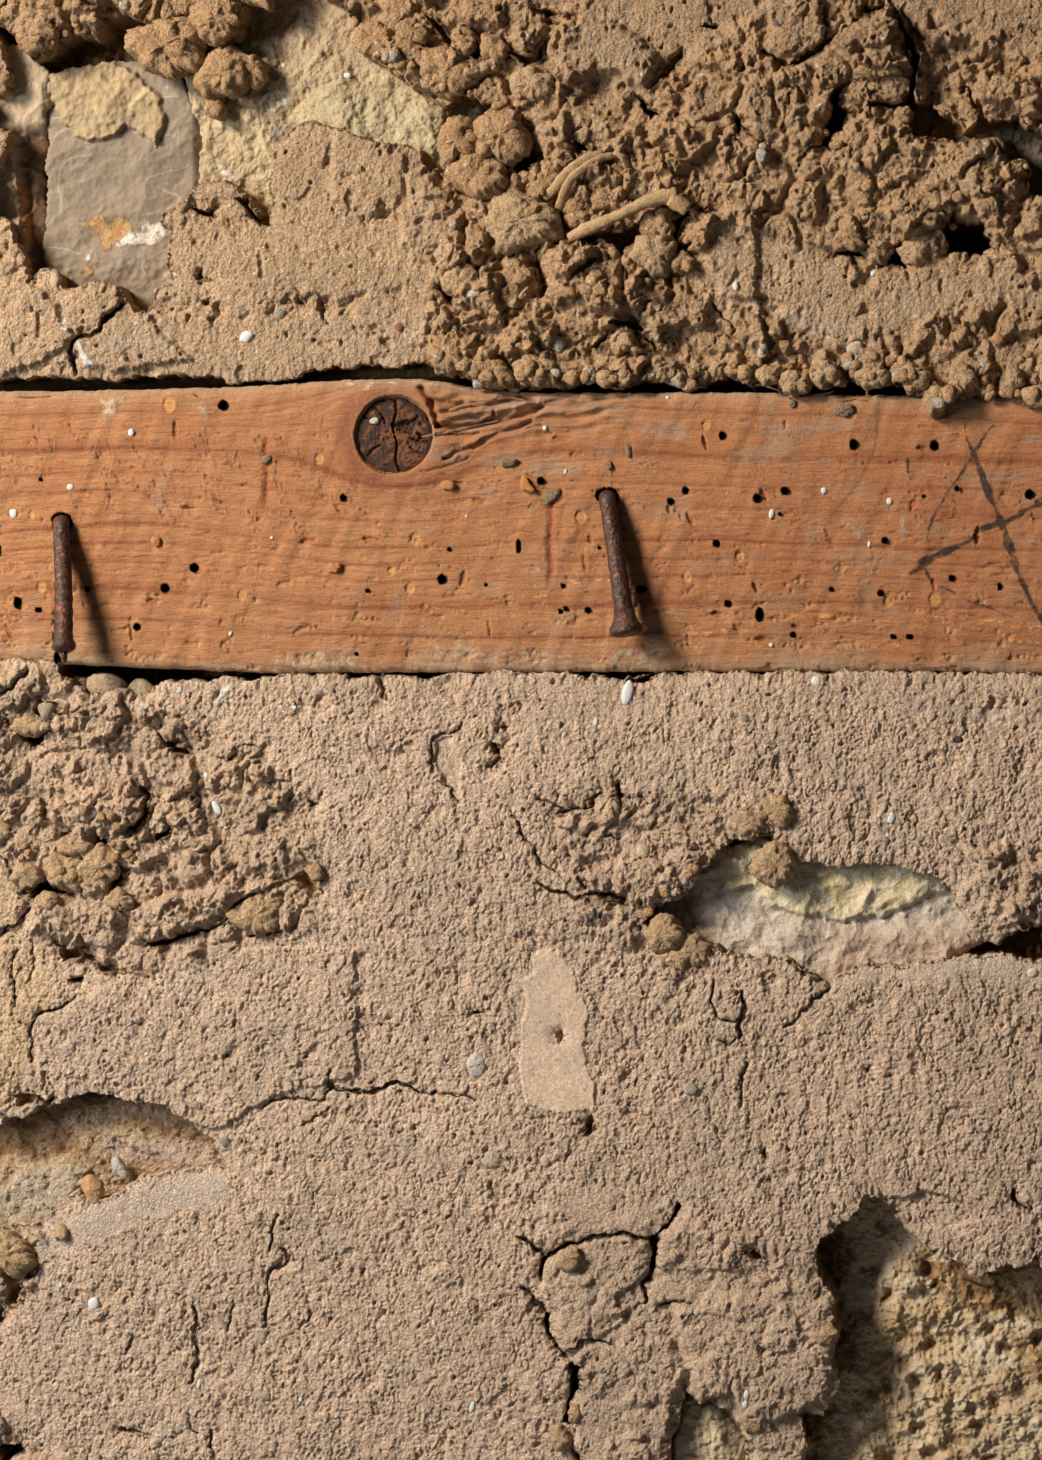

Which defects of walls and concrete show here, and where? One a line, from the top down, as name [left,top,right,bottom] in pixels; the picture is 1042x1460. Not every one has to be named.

spalling [0,0,275,122]
crack [761,0,898,169]
spalling [344,0,1042,419]
crack [0,855,75,1063]
crack [263,1070,476,1124]
crack [517,1237,544,1256]
crack [585,1231,644,1242]
crack [522,1287,546,1311]
crack [641,1275,692,1305]